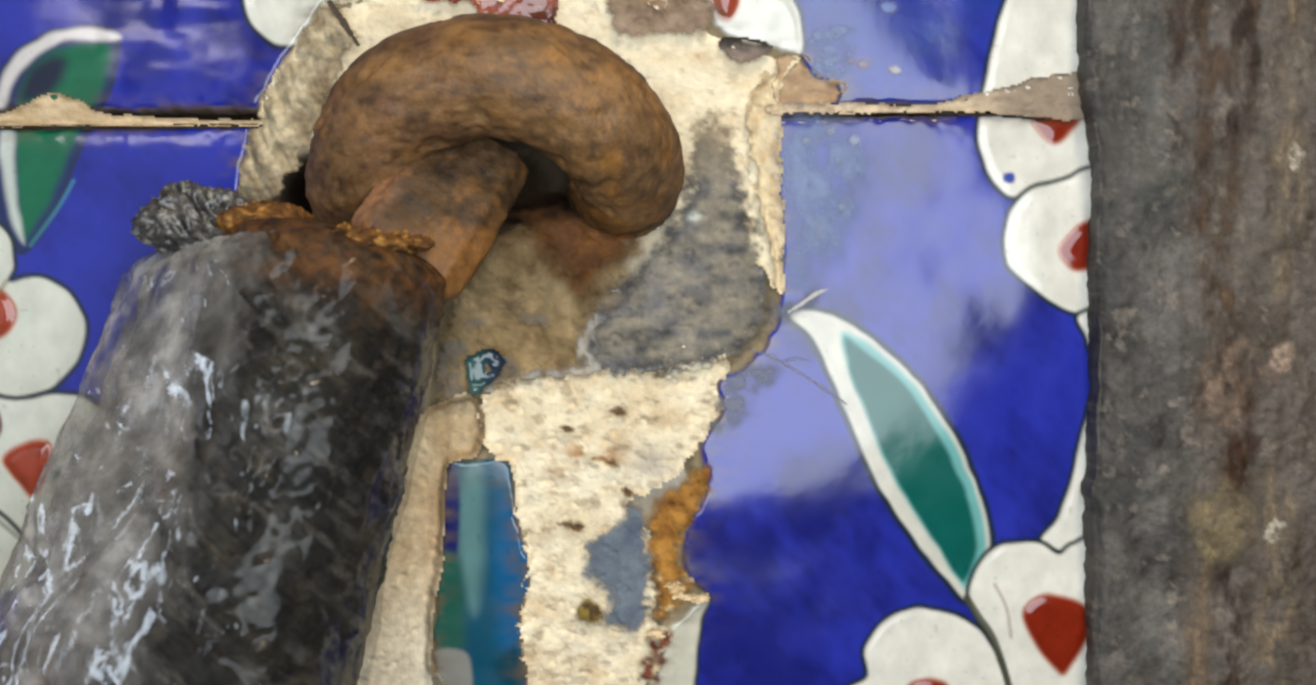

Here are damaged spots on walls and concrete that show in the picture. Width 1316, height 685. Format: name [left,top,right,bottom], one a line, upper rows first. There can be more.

crack [0,122,263,130]
flaking render [262,69,280,113]
crack [836,111,1051,121]
flaking render [271,0,848,316]
rust [212,199,436,255]
flaking render [477,346,730,685]
rust [645,468,711,639]